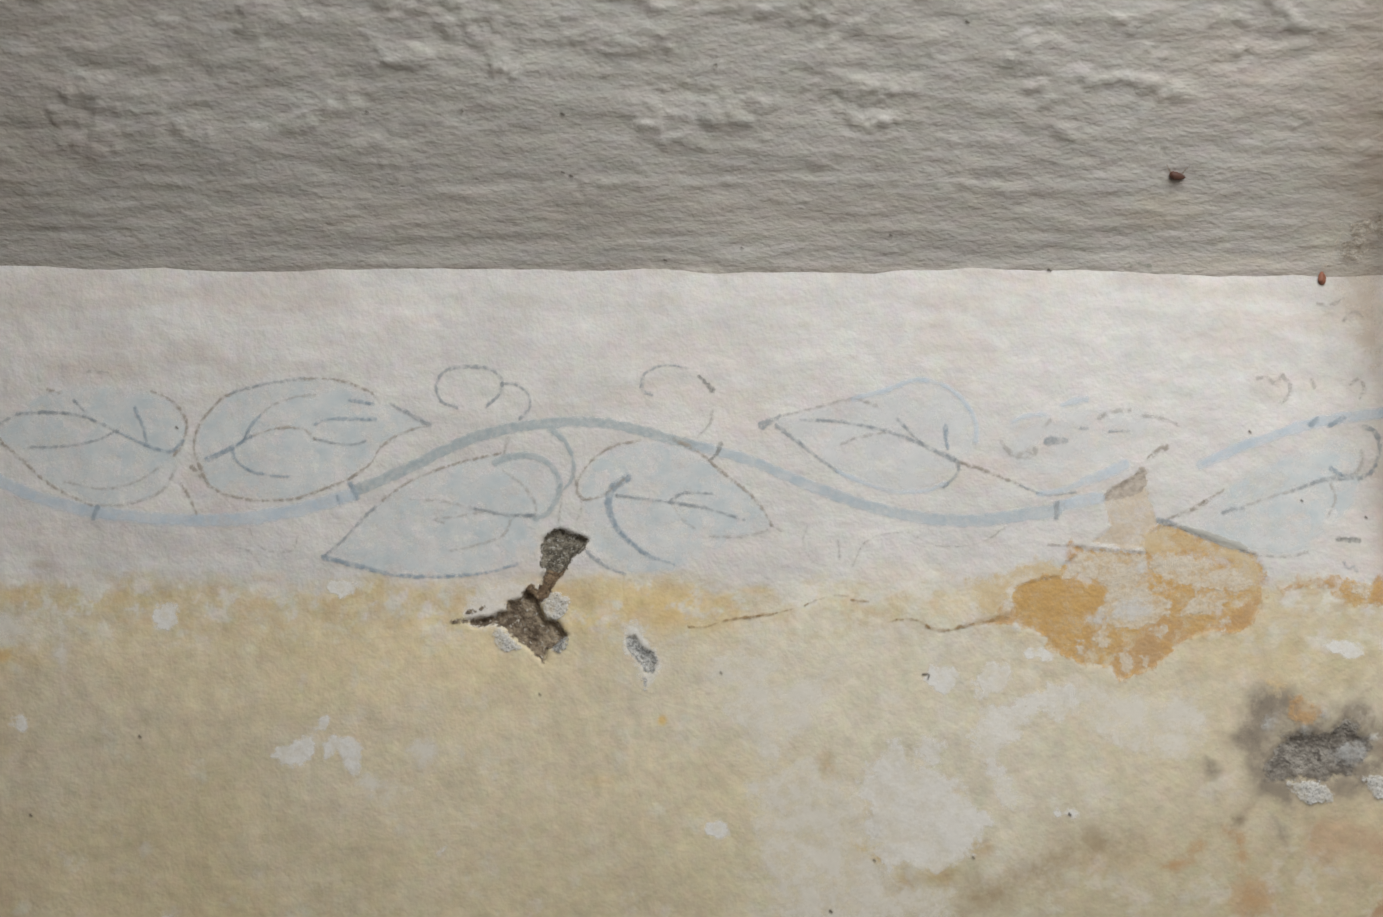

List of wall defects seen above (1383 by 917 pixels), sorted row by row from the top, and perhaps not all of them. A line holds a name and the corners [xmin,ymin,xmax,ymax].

spalling [450,528,594,663]
crack [896,618,1015,631]
spalling [623,627,660,690]